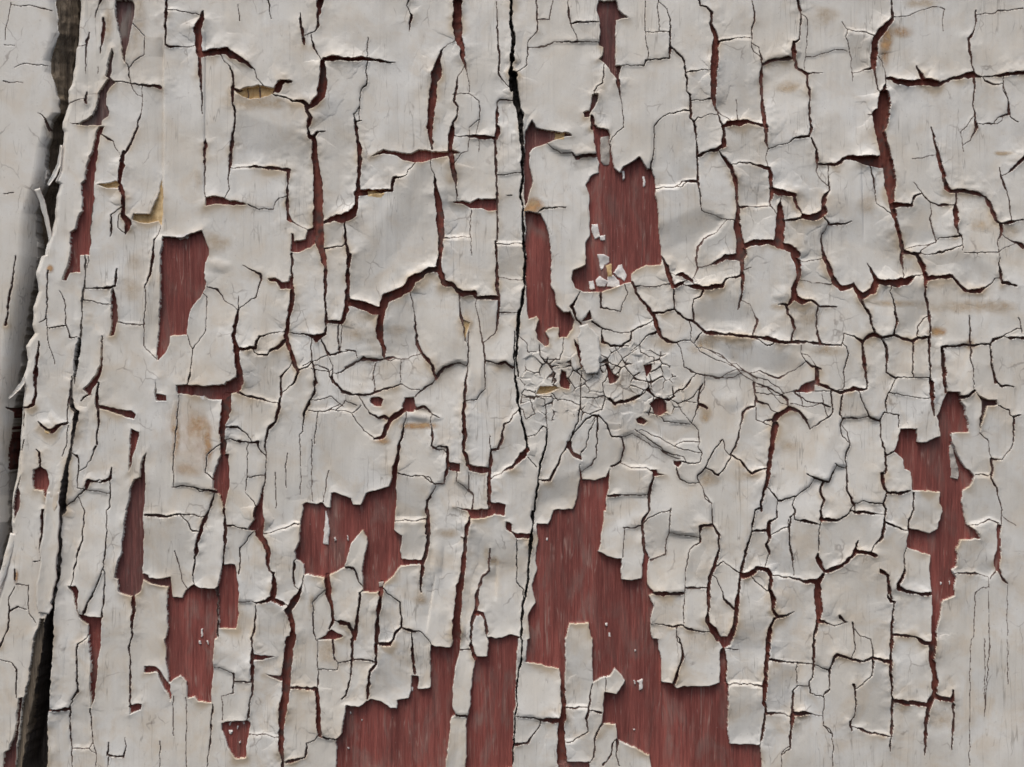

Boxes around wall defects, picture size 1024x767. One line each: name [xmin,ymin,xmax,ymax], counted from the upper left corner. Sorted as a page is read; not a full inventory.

crack [3,2,52,83]
crack [0,225,162,767]
crack [77,0,162,237]
crack [128,596,187,767]
peeling [133,181,209,360]
peeling [115,429,239,702]
crack [144,0,531,767]
peeling [295,472,423,592]
peeling [336,469,762,767]
peeling [572,0,662,292]
crack [515,0,1024,767]
peeling [894,392,997,638]